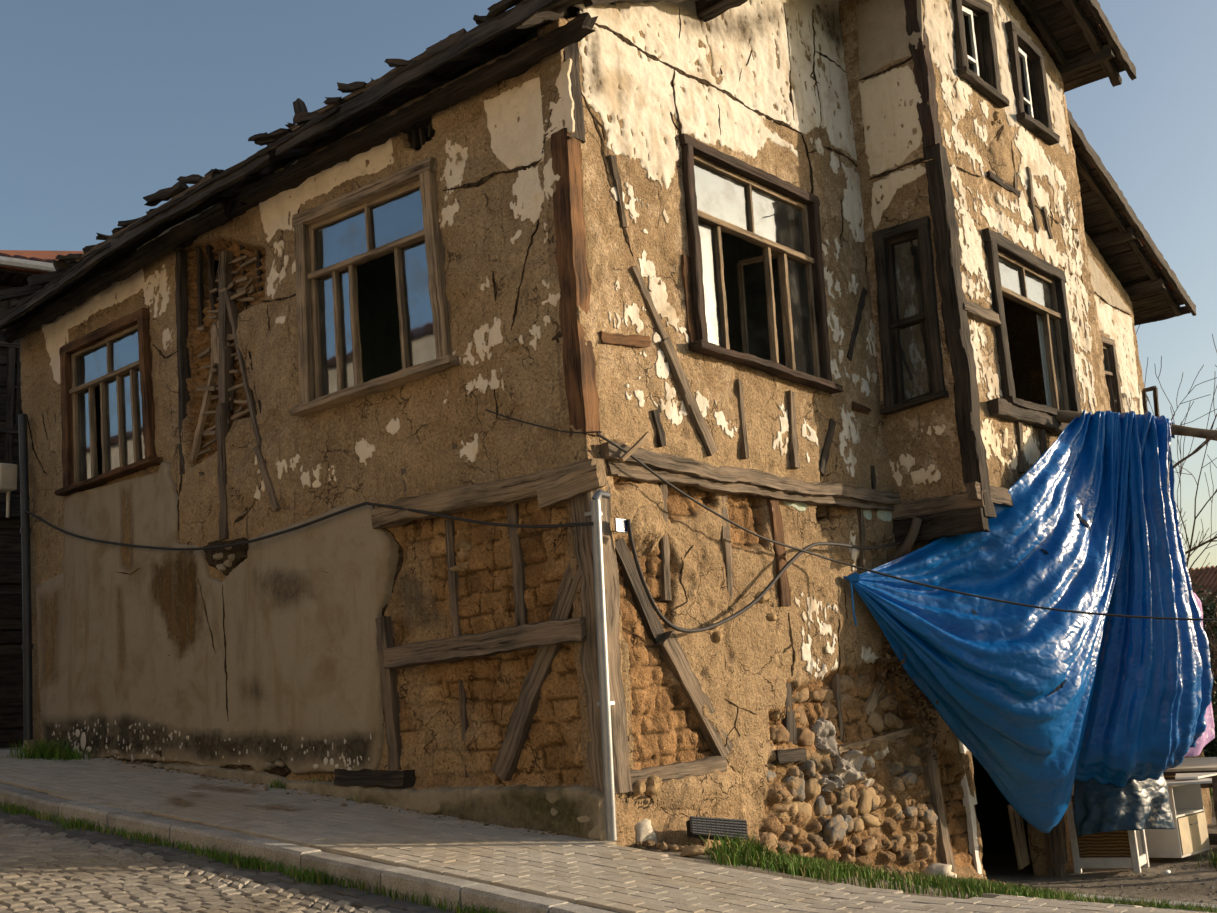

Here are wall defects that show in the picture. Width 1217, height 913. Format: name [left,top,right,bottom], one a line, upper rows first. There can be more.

crack [595,7,1015,241]
crack [492,219,539,331]
peeling [510,158,560,244]
crack [442,92,633,256]
peeling [939,65,1097,414]
peeling [452,317,504,395]
peeling [608,249,738,439]
peeling [980,418,1041,470]
crack [783,613,795,677]
peeling [794,592,838,684]
damp [45,717,370,765]
crack [725,699,757,747]